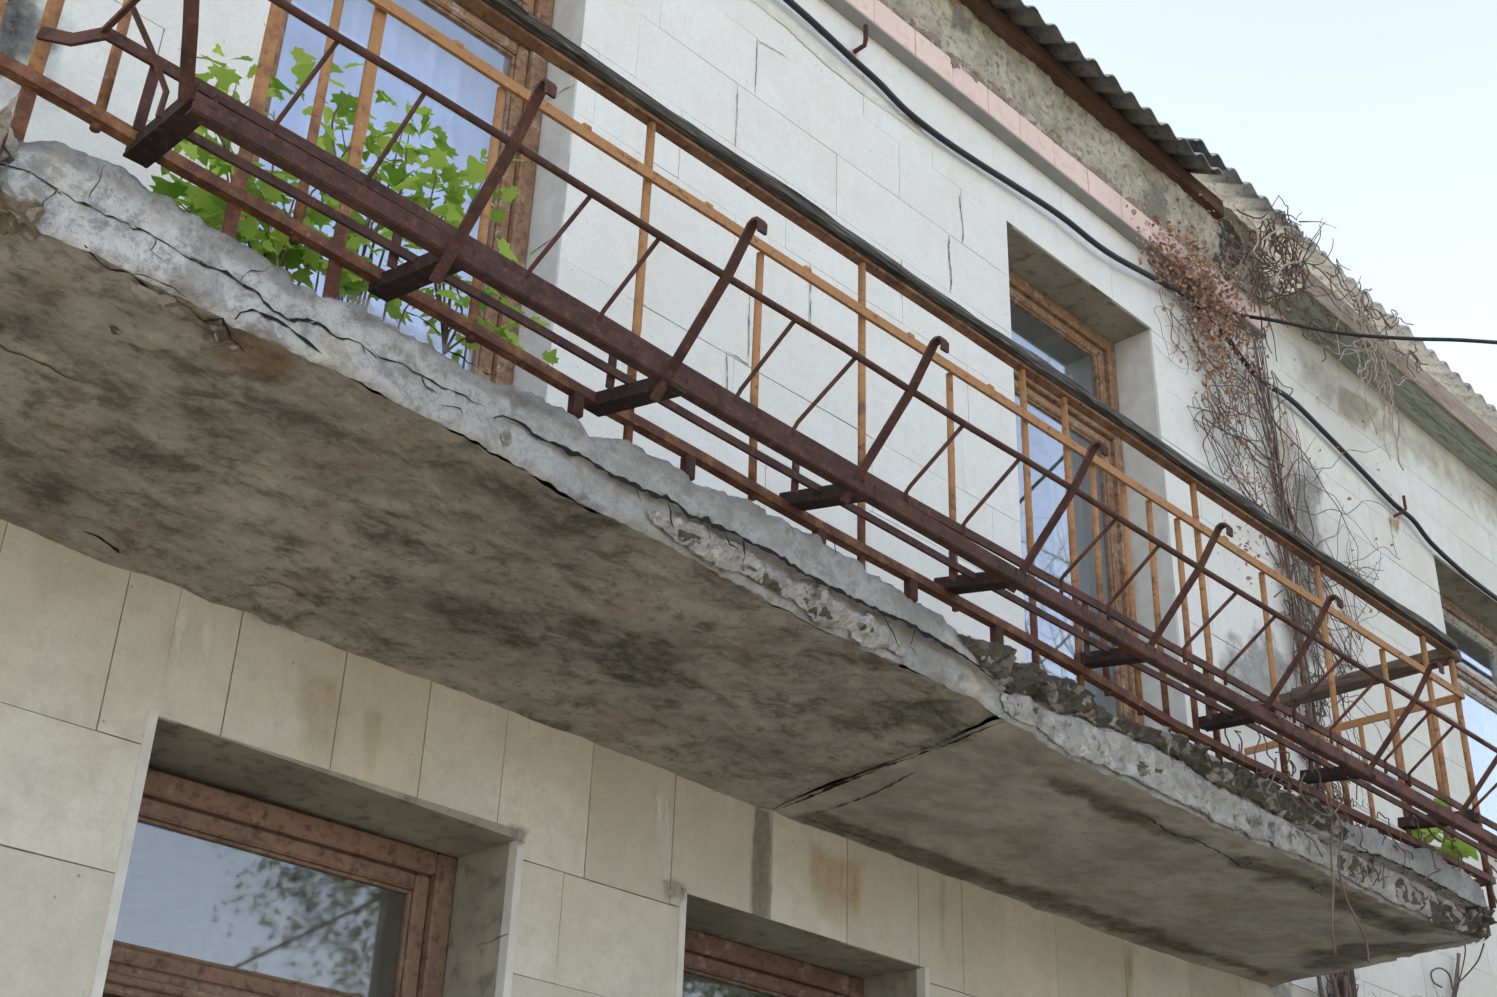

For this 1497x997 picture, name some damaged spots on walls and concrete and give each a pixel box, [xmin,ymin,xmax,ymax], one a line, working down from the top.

damp [0,0,55,59]
spalling [0,92,20,162]
spalling [879,0,1153,221]
spalling [0,186,46,242]
crack [0,164,996,681]
spalling [646,509,907,656]
crack [778,722,1002,843]
spalling [958,634,1497,942]